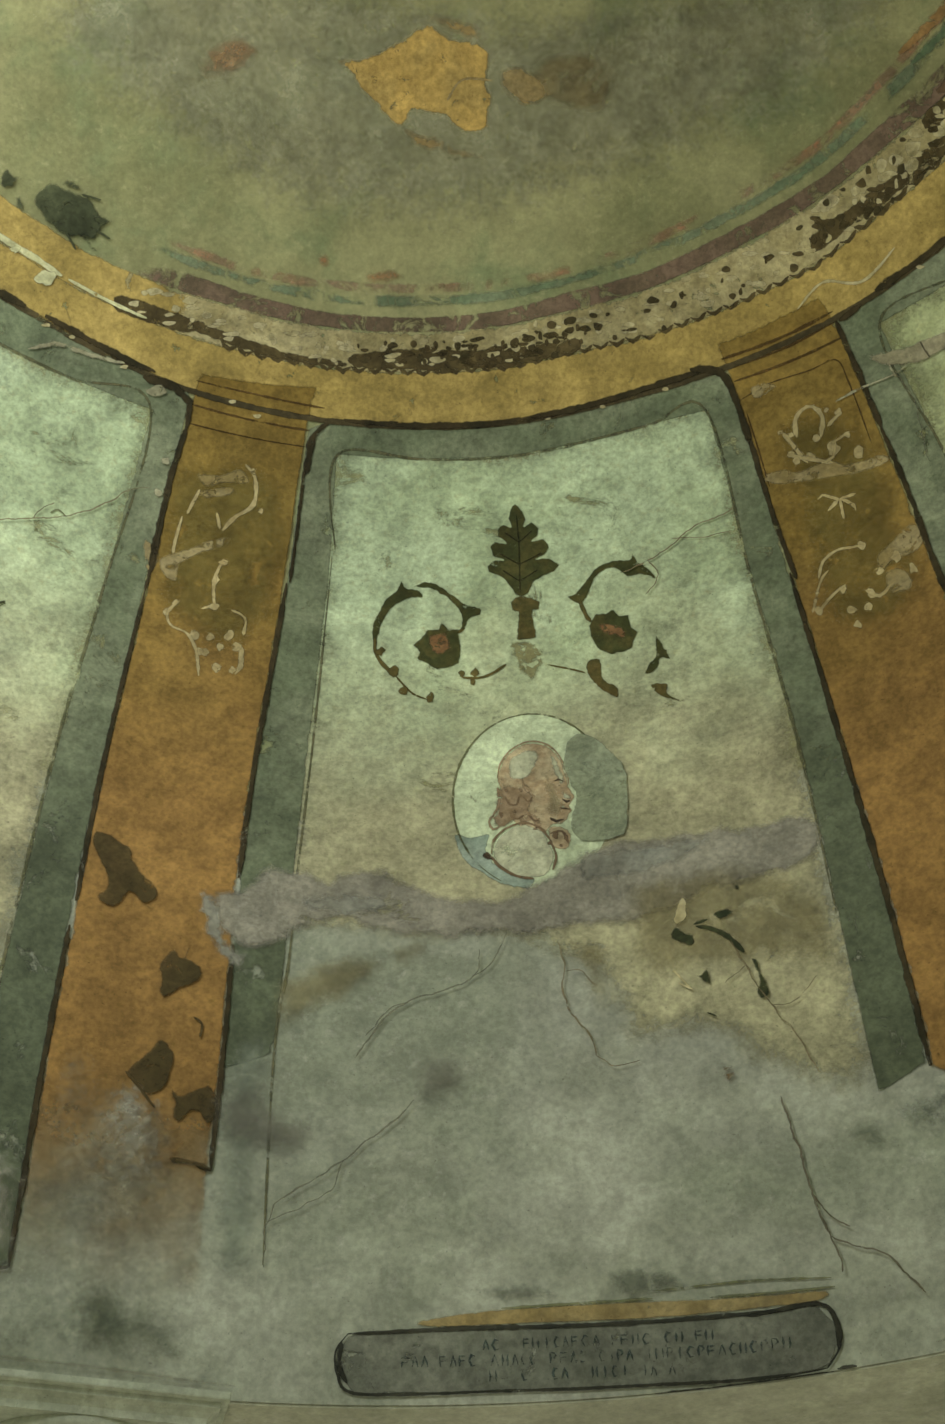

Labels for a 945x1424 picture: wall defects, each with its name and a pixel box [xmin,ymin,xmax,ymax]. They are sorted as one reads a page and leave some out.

peeling [341,19,546,155]
peeling [0,233,147,319]
crack [262,1101,413,1267]
crack [780,1096,926,1293]